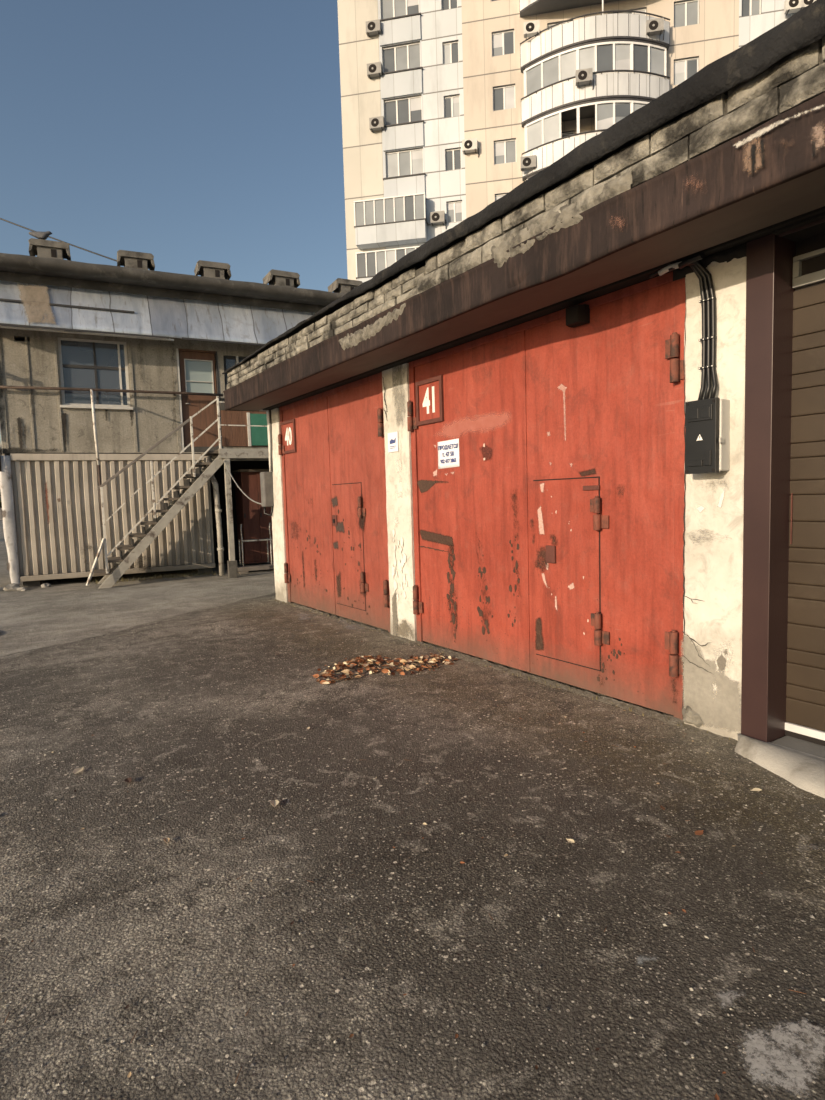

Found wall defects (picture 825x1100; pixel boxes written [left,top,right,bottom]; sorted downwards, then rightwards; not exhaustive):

peeling [812,123,825,150]
flaking render [392,529,408,636]
corrosion [420,530,457,635]
flaking render [713,645,733,672]
spalling [682,706,704,728]